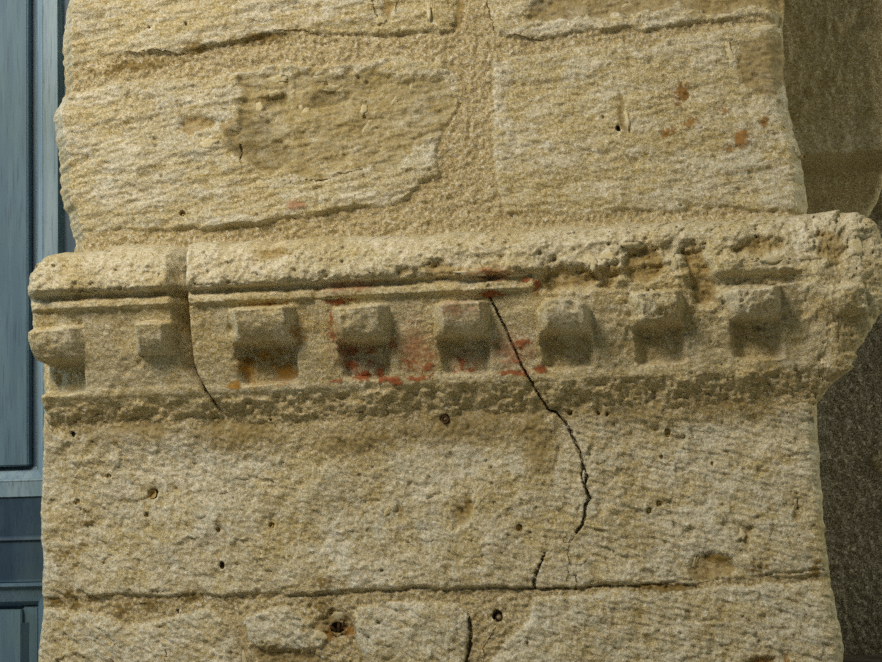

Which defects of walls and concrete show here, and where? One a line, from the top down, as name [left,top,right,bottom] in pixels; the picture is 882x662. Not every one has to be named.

crack [479,263,711,590]
crack [466,613,496,662]